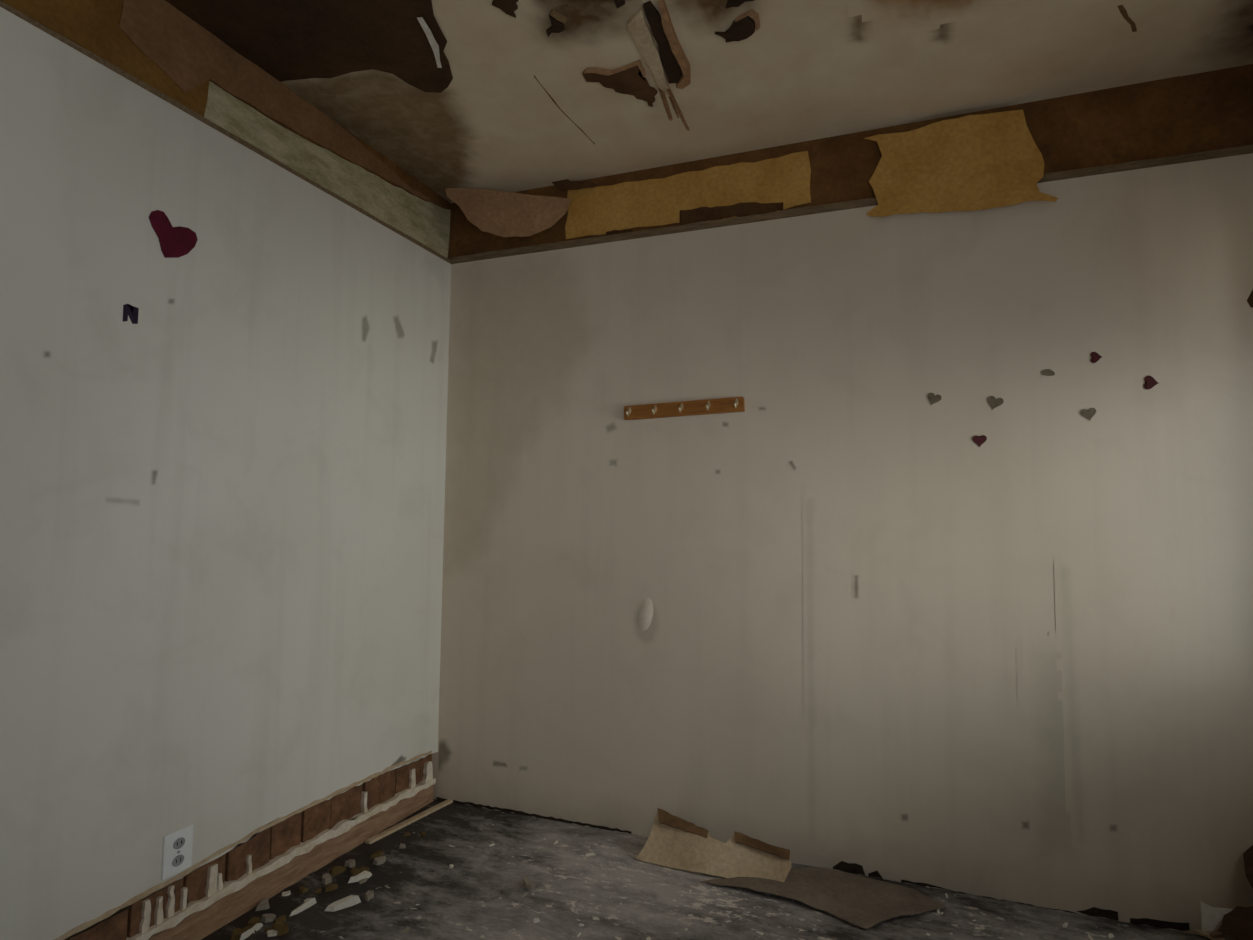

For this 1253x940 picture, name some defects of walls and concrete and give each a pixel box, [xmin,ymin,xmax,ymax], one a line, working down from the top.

peeling [492,0,519,18]
peeling [546,8,567,37]
peeling [715,0,760,43]
spalling [583,0,691,131]
peeling [552,179,599,191]
spalling [54,750,436,940]